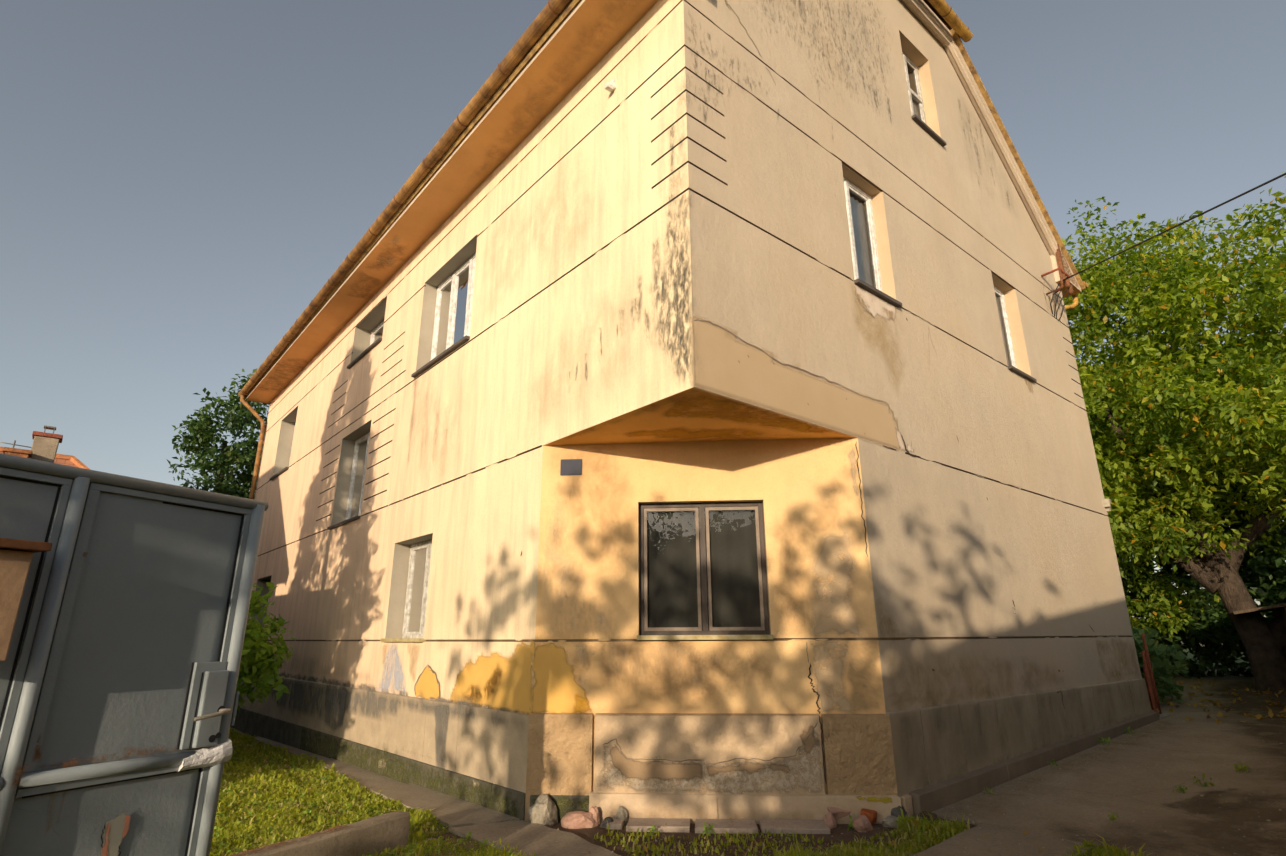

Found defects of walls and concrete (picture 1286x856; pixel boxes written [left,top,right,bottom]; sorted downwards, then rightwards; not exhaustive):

leakage [639,231,688,373]
flaking render [855,286,908,321]
leakage [270,652,517,769]
spalling [603,722,822,794]
crack [806,644,826,782]